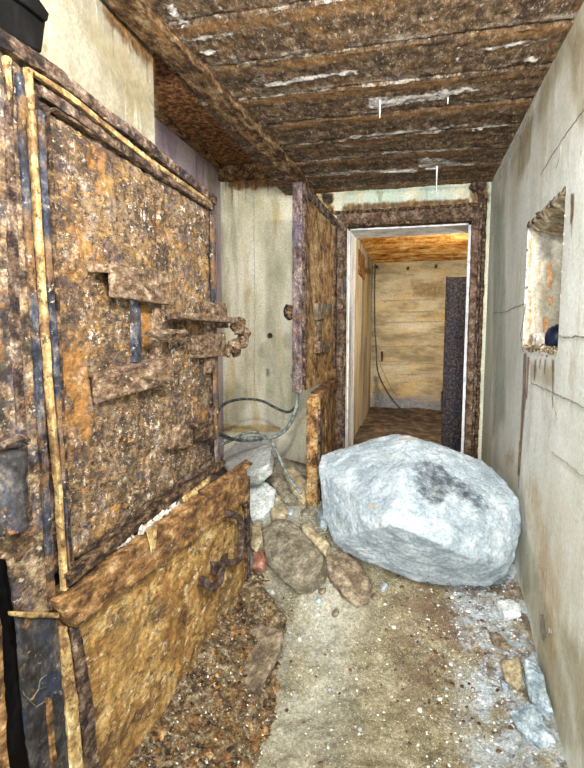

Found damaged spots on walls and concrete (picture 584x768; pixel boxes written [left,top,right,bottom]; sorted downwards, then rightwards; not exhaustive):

efflorescence [265,70,357,87]
efflorescence [368,87,479,110]
crack [540,109,584,176]
spalling [522,186,566,357]
corrosion [507,356,538,523]